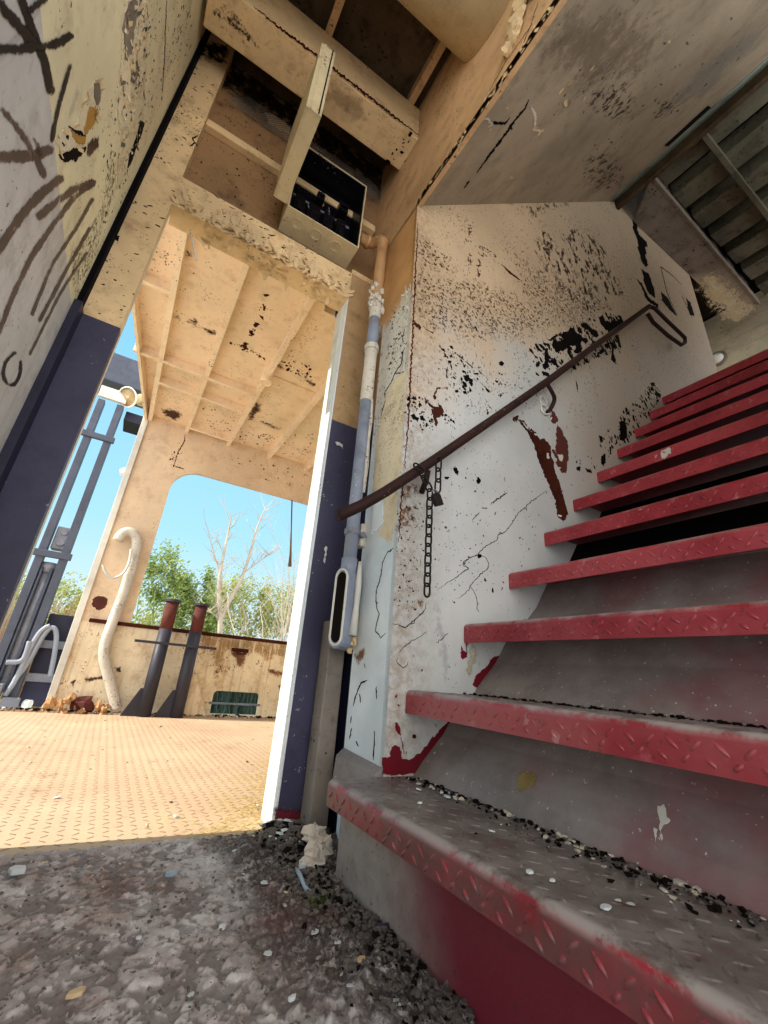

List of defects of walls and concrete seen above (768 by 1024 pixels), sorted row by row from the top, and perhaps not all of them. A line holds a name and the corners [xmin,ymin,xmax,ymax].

spalling [55,0,355,305]
crack [420,0,559,201]
spalling [439,312,623,415]
corrosion [92,596,108,610]
crack [375,490,547,668]
peeling [653,804,670,841]